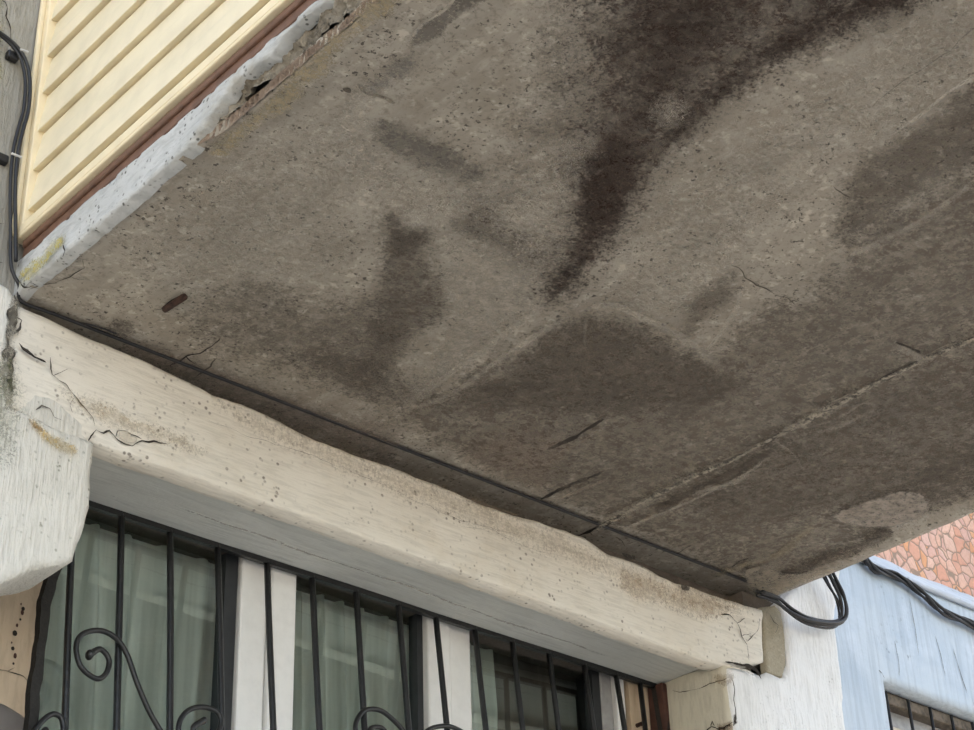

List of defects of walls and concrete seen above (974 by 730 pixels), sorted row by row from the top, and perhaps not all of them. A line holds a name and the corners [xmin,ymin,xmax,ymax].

spalling [197,0,378,145]
crack [0,245,167,446]
damp [192,0,974,595]
crack [578,335,974,546]
crack [672,613,761,730]